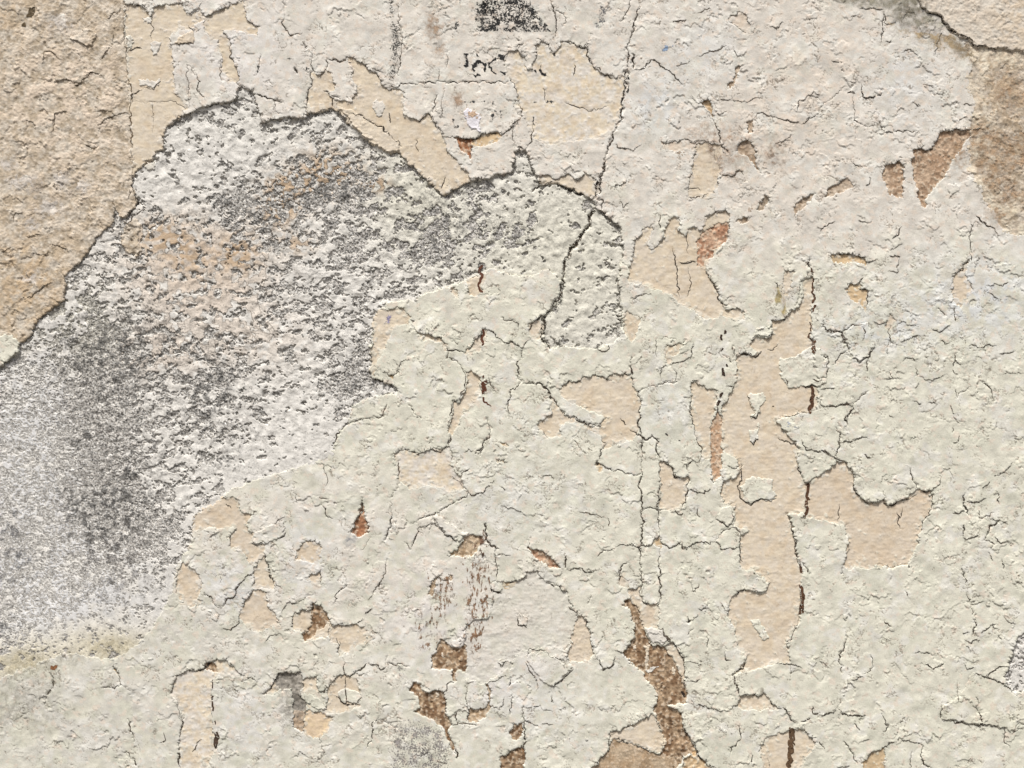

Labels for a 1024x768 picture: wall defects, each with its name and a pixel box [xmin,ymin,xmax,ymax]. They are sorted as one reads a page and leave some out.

crack [371,14,607,144]
crack [621,1,746,88]
crack [714,62,933,177]
crack [853,7,1000,54]
flaking render [882,42,1024,238]
flaking render [0,0,769,680]
crack [366,133,1022,602]
peeling [689,269,933,675]
flaking render [409,682,459,758]
peeling [431,547,594,722]
flaking render [592,572,710,768]
crack [917,570,1018,745]